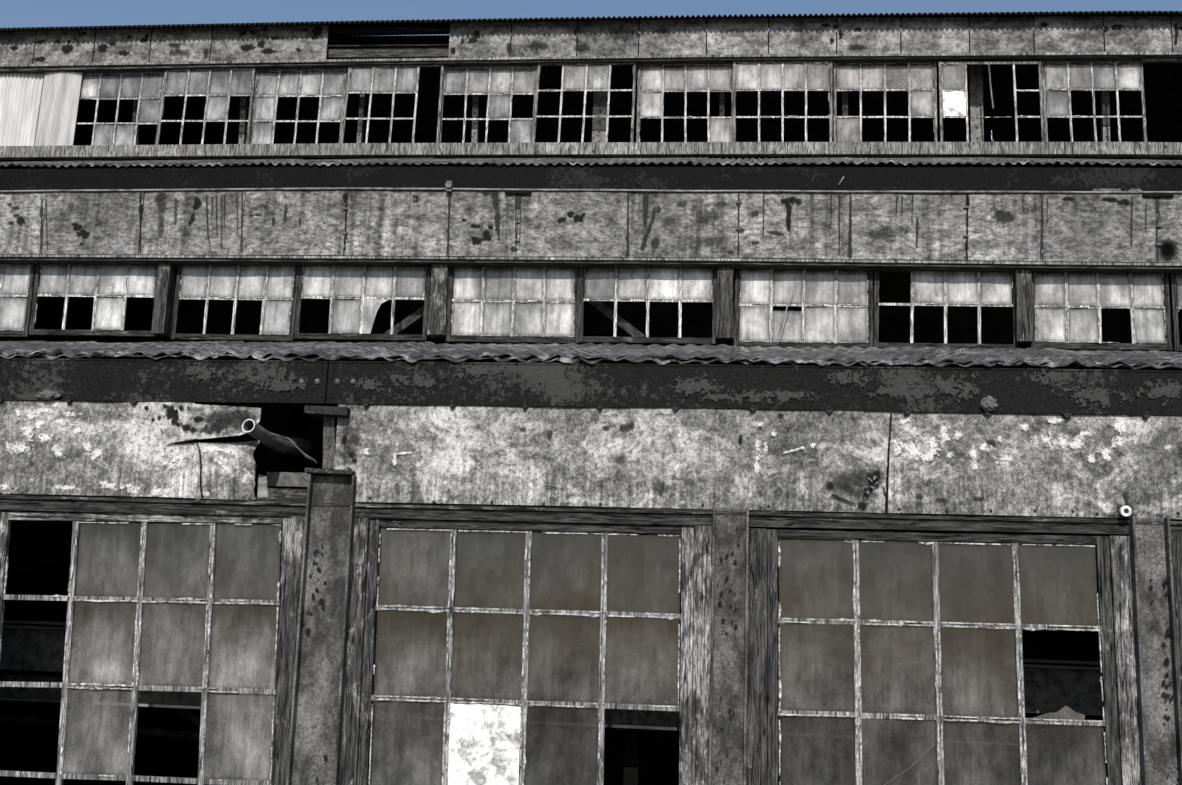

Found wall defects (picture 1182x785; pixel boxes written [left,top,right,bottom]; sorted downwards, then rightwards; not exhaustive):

leakage [155,192,177,236]
leakage [205,194,238,249]
leakage [483,191,500,240]
leakage [641,192,686,252]
leakage [698,202,726,246]
leakage [868,195,919,248]
peeling [6,400,102,459]
peeling [1030,367,1182,462]
peeling [127,448,186,470]
peeling [100,481,165,496]